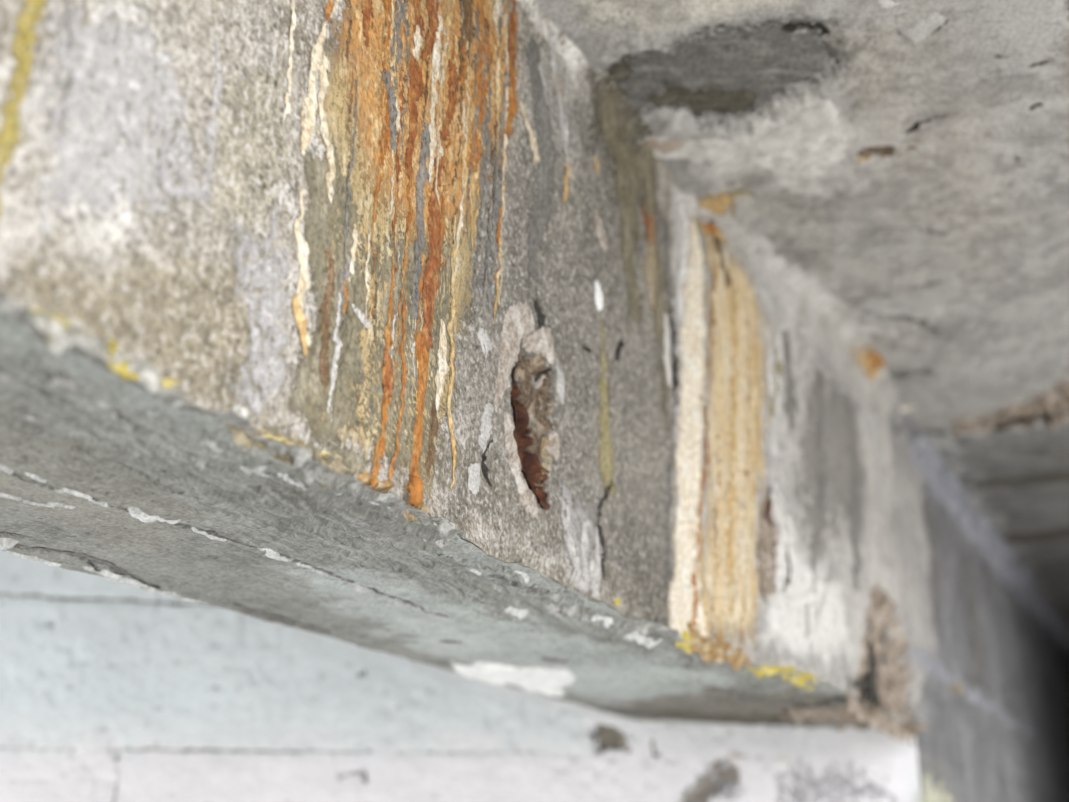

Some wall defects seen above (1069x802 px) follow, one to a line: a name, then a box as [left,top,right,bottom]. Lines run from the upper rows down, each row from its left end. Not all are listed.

rust [289,0,540,541]
spalling [478,299,566,518]
damp [526,23,575,280]
damp [594,17,849,641]
rust [675,220,771,671]
spalling [950,381,1069,435]